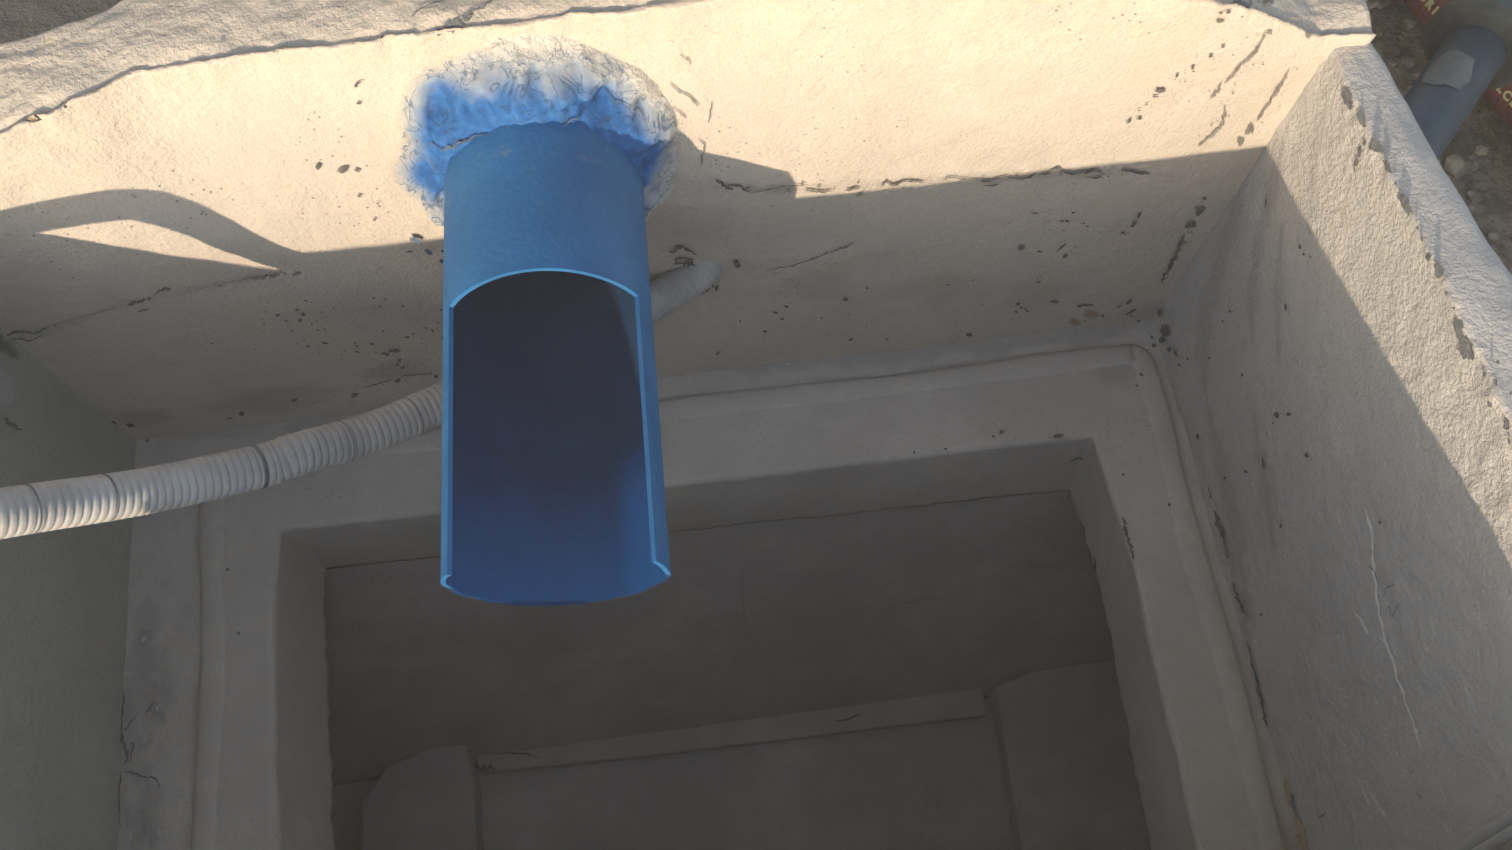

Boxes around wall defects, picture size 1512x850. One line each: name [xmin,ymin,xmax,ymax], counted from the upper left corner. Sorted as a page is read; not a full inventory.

crack [427,134,489,151]
crack [564,54,1150,196]
crack [6,270,302,342]